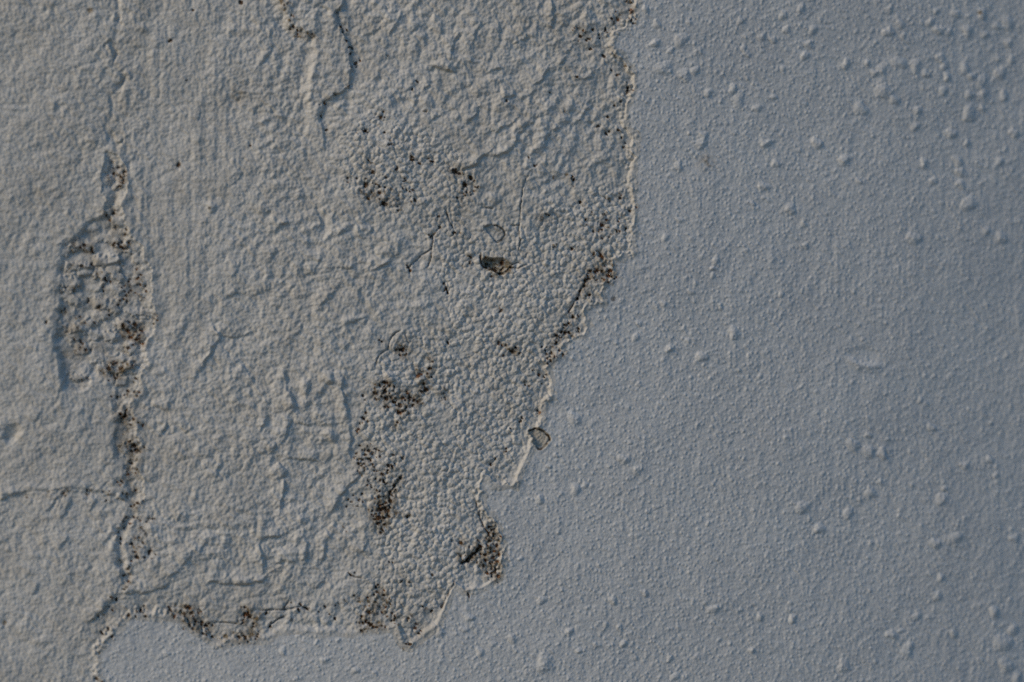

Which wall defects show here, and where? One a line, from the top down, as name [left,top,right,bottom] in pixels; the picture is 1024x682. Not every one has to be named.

peeling [0,0,643,682]